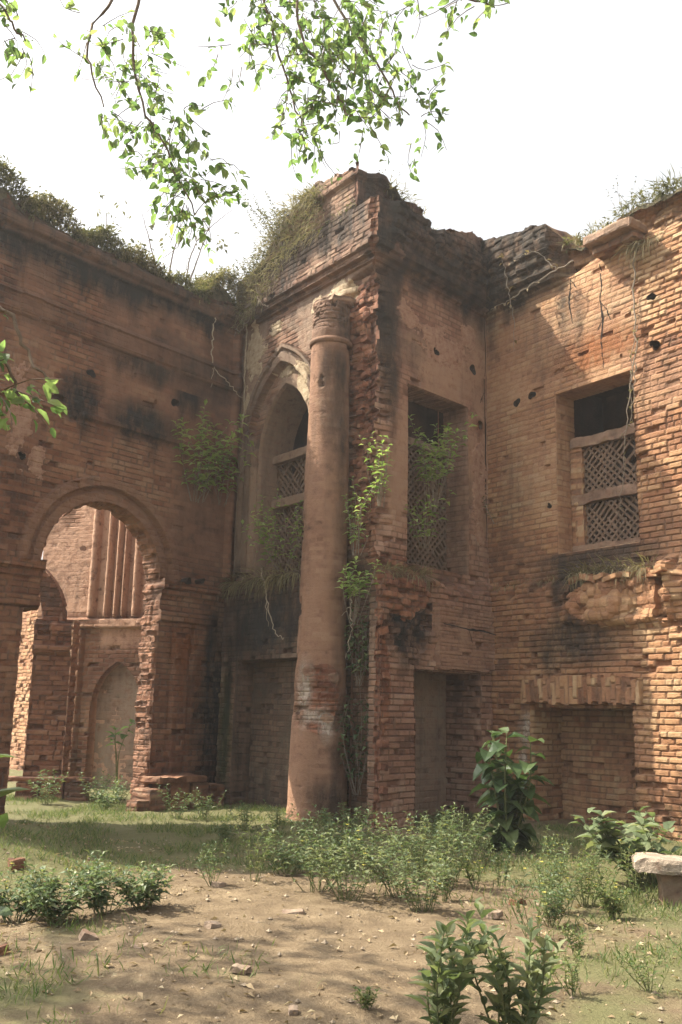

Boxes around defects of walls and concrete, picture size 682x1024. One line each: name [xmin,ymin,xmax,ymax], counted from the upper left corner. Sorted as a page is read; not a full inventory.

damp [57,376,97,429]
spalling [311,161,440,829]
crack [444,623,496,643]
spalling [300,664,341,734]